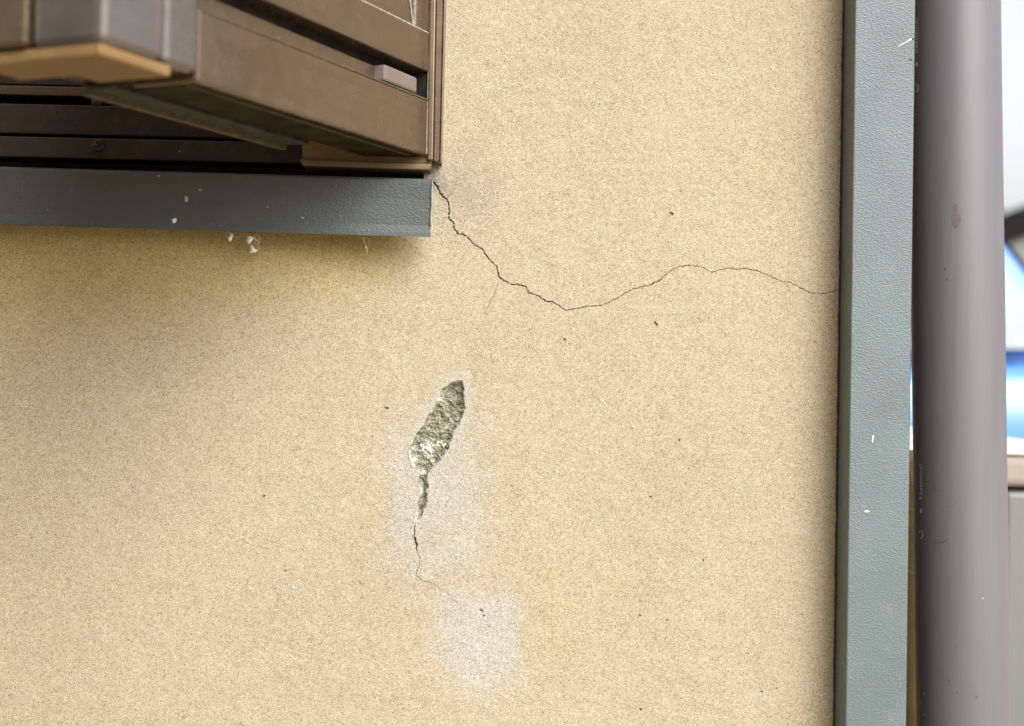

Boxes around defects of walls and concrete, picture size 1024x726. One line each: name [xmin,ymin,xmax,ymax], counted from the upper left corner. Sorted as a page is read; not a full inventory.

crack [433,182,838,319]
flaking render [407,375,470,525]
crack [413,526,458,604]